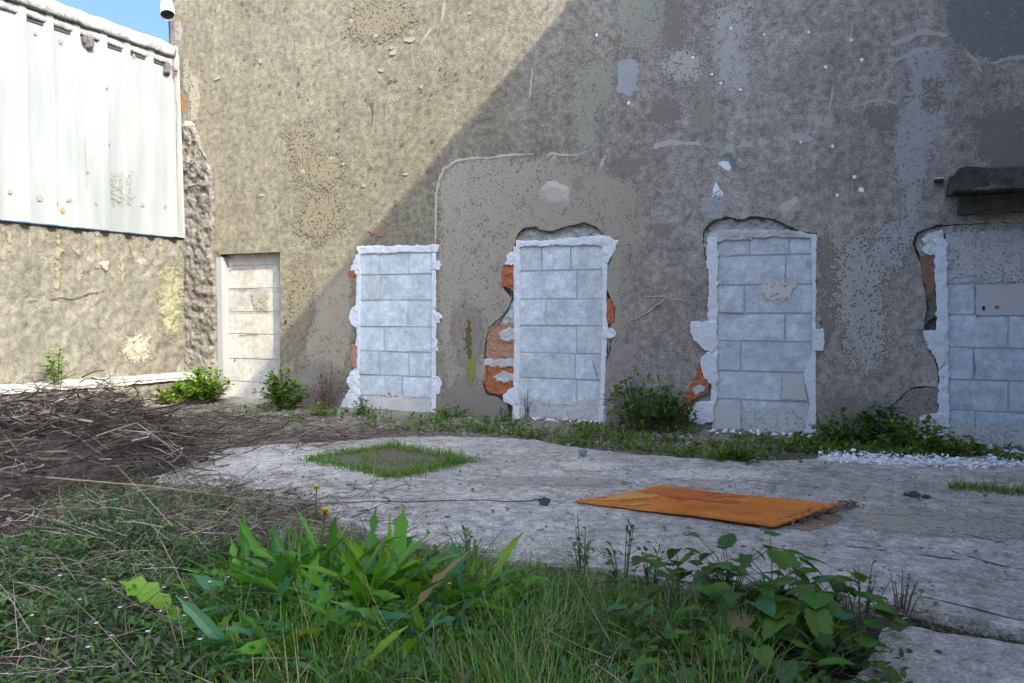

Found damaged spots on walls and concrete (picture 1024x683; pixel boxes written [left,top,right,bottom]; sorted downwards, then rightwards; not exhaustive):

flaking render [502,265,515,292]
flaking render [919,254,935,294]
flaking render [606,299,615,325]
flaking render [350,344,358,368]
flaking render [483,323,515,395]
flaking render [680,363,710,427]
crack [883,386,937,414]